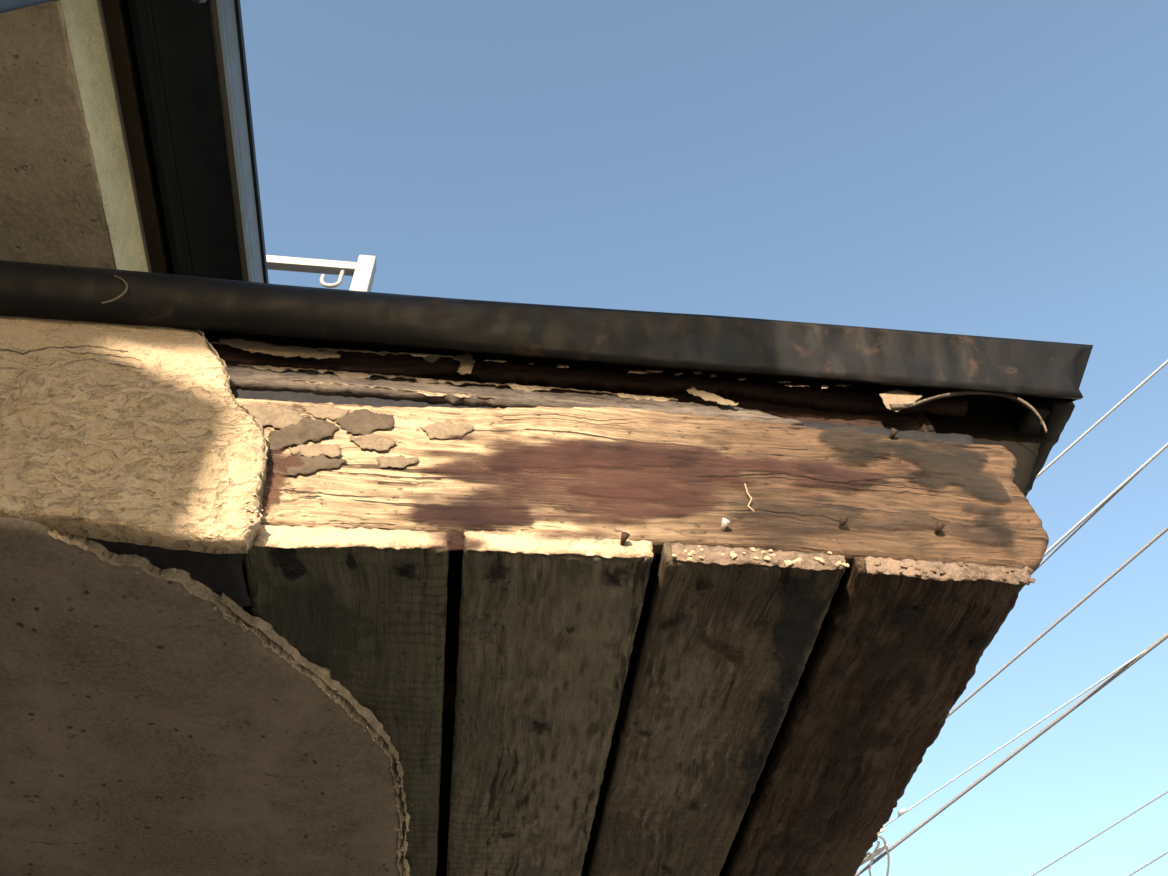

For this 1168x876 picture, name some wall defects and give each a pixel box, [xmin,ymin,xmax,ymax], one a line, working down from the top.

crack [0,345,142,369]
peeling [197,330,738,549]
damp [395,427,1016,551]
peeling [778,381,851,389]
peeling [879,389,1047,435]
spalling [47,529,412,876]